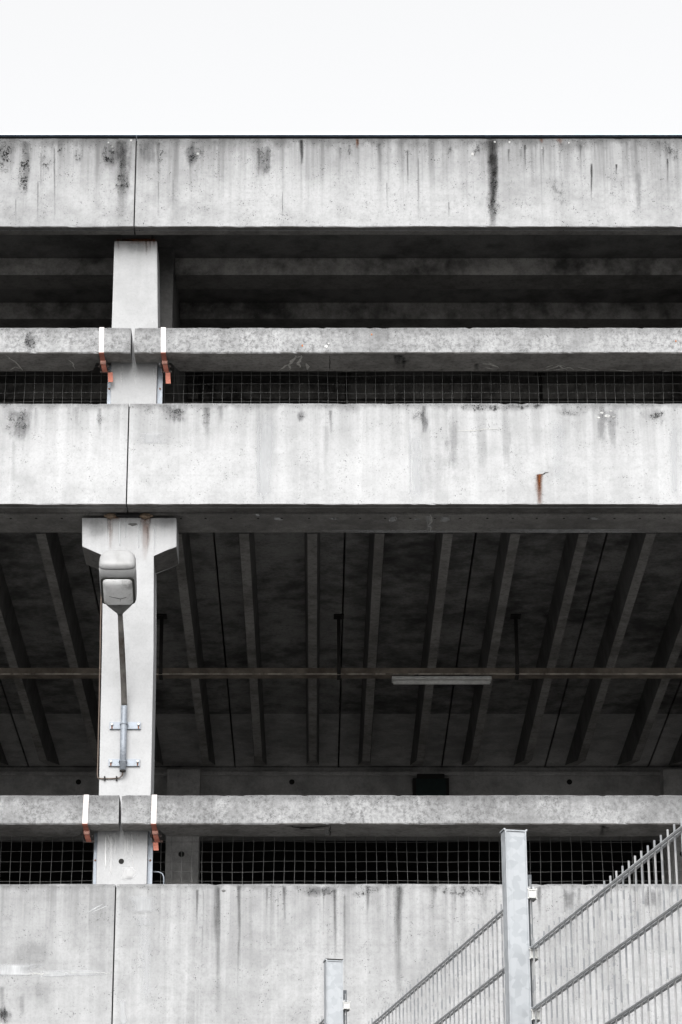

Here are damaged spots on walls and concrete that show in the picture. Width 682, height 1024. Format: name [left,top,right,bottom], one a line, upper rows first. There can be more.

damp [474,141,498,221]